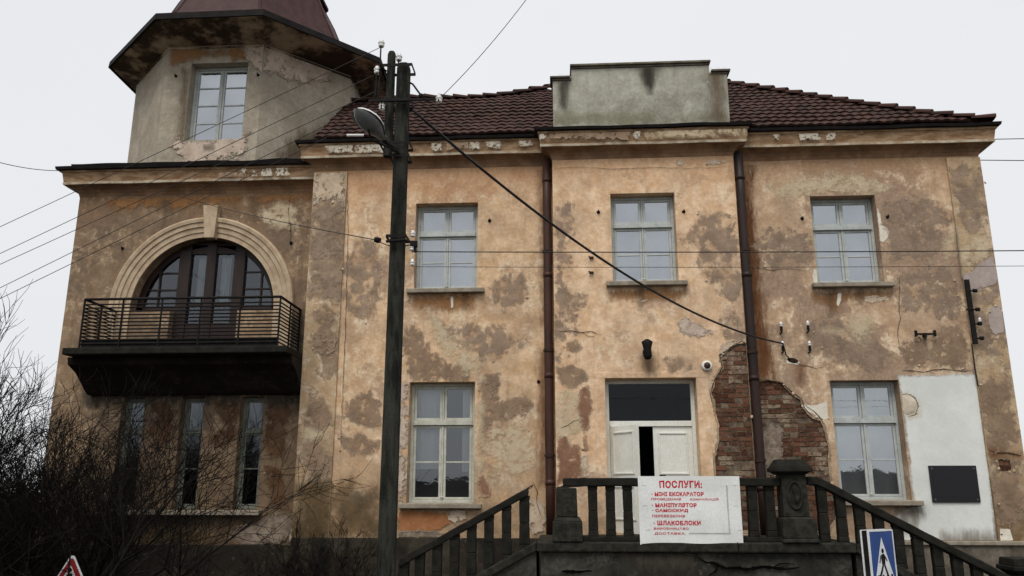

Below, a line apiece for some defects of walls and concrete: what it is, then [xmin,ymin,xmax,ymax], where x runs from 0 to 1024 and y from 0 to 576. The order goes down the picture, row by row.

flaking render [166,129,290,177]
peeling [325,144,384,153]
peeling [431,141,501,151]
flaking render [225,389,383,545]
flaking render [397,271,534,538]
flaking render [677,211,836,536]
flaking render [809,161,1024,541]
crack [898,277,969,372]